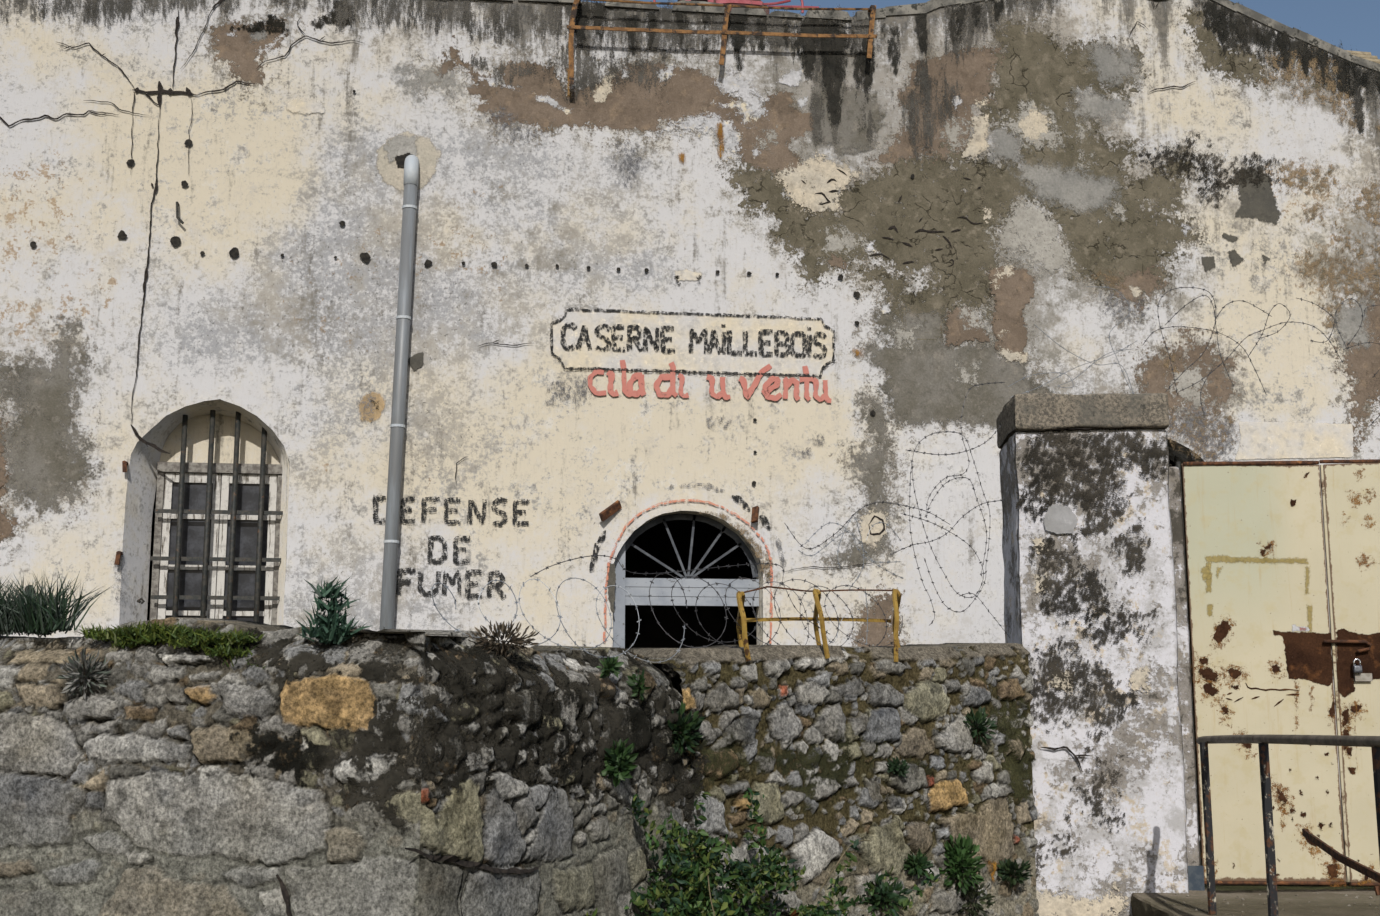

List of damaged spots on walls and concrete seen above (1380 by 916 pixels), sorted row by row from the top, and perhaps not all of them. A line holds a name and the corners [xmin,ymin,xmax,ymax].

peeling [191,5,304,110]
damp [0,0,1058,161]
peeling [1171,2,1280,95]
damp [1195,0,1380,134]
crack [0,0,362,454]
peeling [414,8,1253,442]
damp [1139,132,1287,210]
peeling [1235,167,1282,225]
damp [1332,293,1375,348]
rust [1192,617,1258,760]
rust [1267,657,1368,775]
rust [1270,769,1374,890]